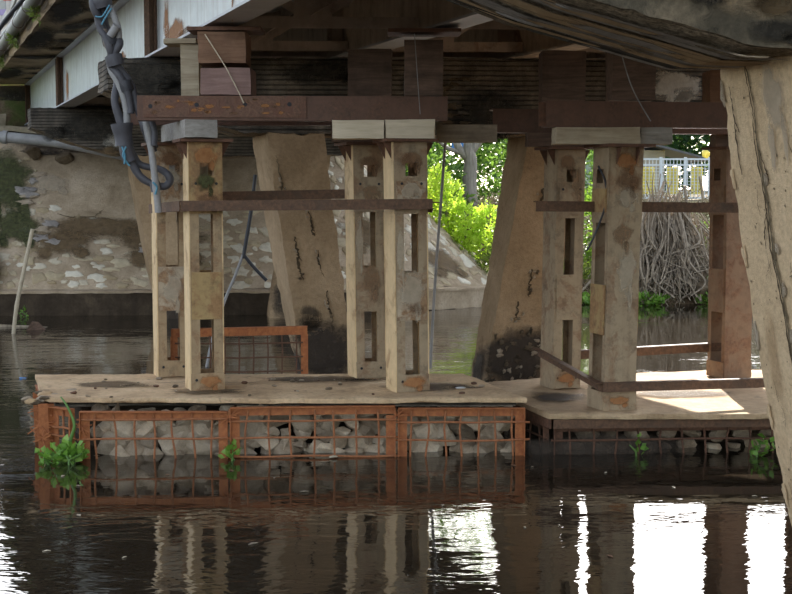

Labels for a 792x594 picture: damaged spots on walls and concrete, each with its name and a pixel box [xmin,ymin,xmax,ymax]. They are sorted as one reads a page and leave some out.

crack [729,66,792,362]
crack [293,210,333,329]
crack [510,269,539,323]
damp [268,307,388,388]
damp [424,327,541,391]